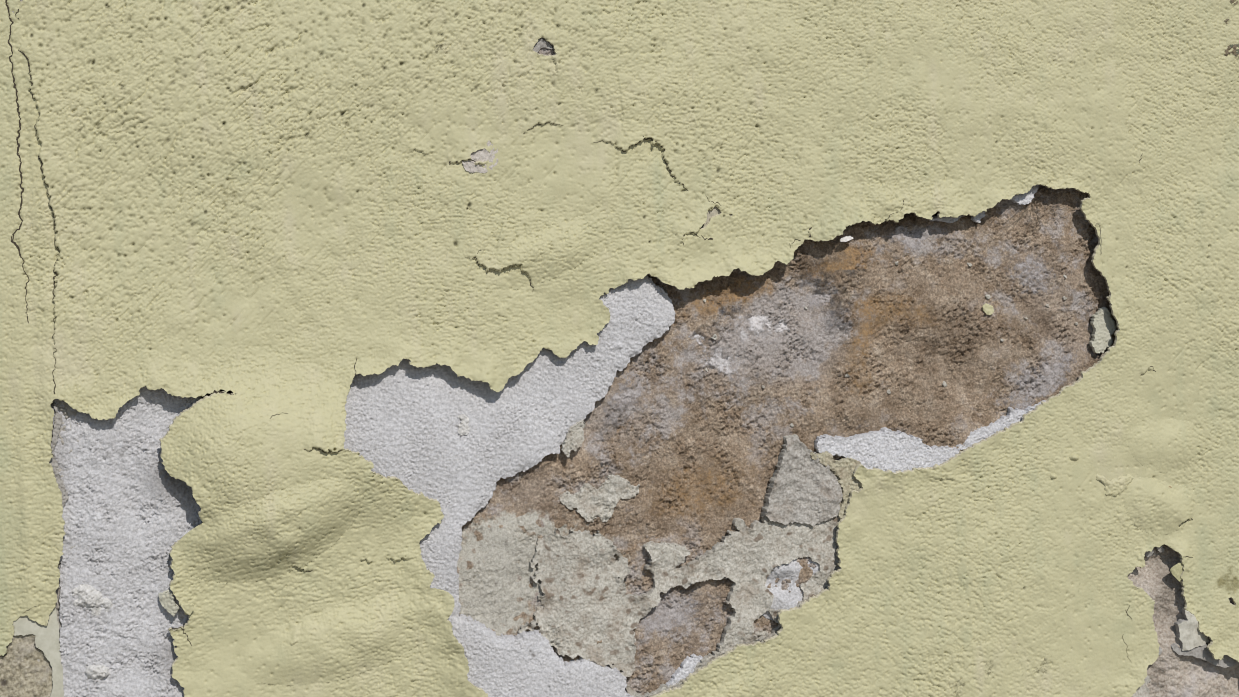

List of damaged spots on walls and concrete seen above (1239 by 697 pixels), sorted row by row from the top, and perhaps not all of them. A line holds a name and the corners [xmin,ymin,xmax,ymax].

crack [5,0,60,394]
peeling [0,386,233,697]
spalling [344,184,1120,697]
peeling [1128,544,1239,697]